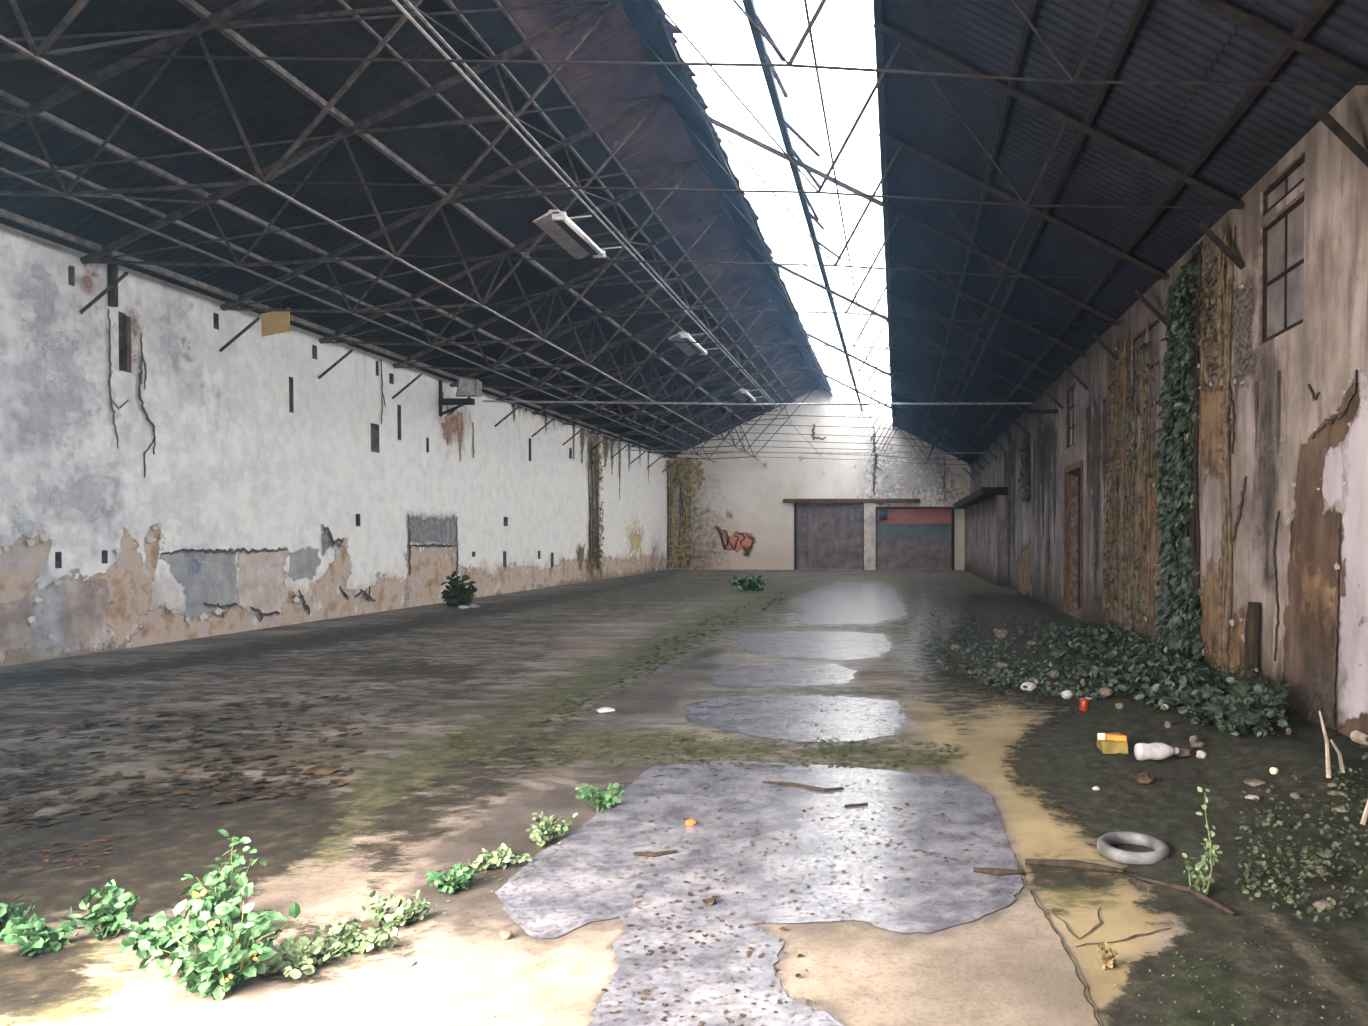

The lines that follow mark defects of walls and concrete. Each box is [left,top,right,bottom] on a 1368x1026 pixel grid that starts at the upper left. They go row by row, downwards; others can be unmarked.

crack [107,308,156,477]
spalling [0,514,414,663]
spalling [1282,370,1368,737]
crack [1008,841,1171,1026]